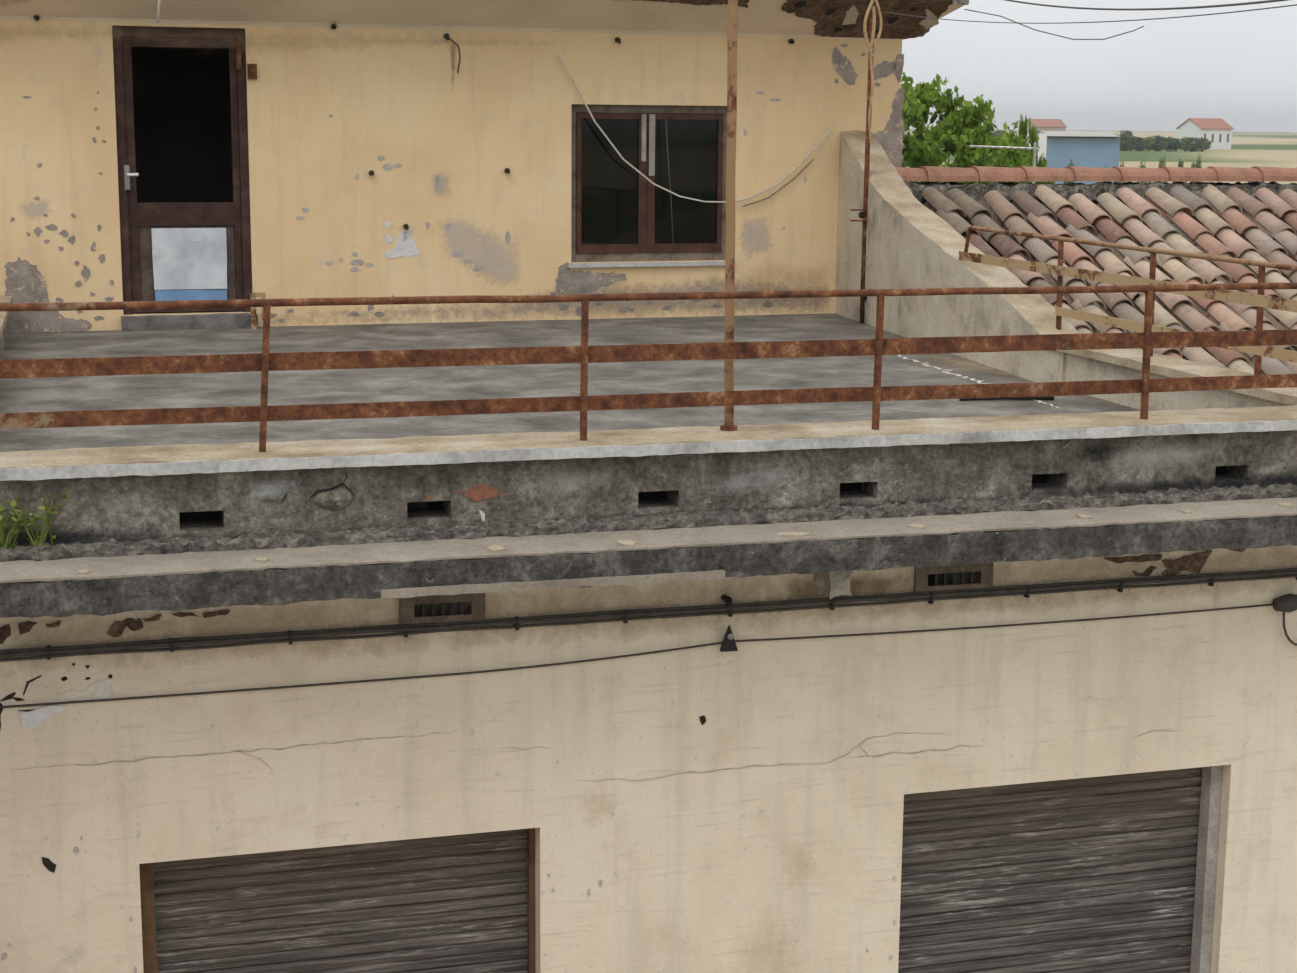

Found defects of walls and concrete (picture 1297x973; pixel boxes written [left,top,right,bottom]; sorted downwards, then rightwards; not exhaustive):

spalling [633,0,749,8]
spalling [781,0,953,167]
peeling [11,197,76,251]
peeling [325,221,420,272]
spalling [4,225,114,333]
spalling [1103,550,1212,576]
spalling [0,620,61,644]
spalling [106,610,230,638]
crack [577,732,983,782]